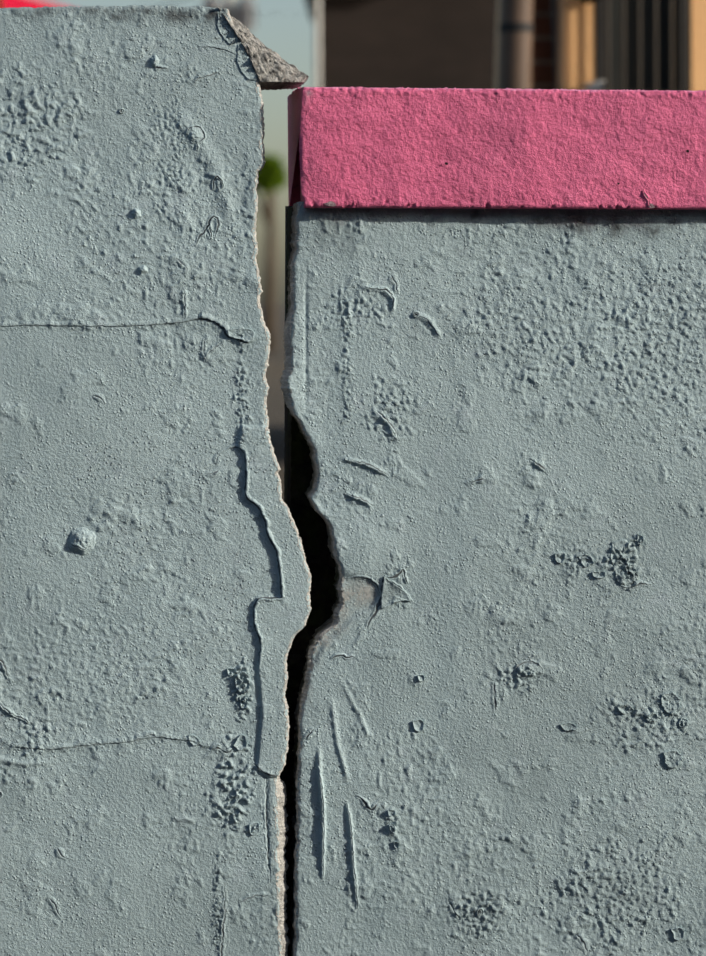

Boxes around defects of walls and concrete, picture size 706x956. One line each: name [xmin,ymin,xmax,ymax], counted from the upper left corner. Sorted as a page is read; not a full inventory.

crack [0,214,255,362]
spalling [206,7,414,956]